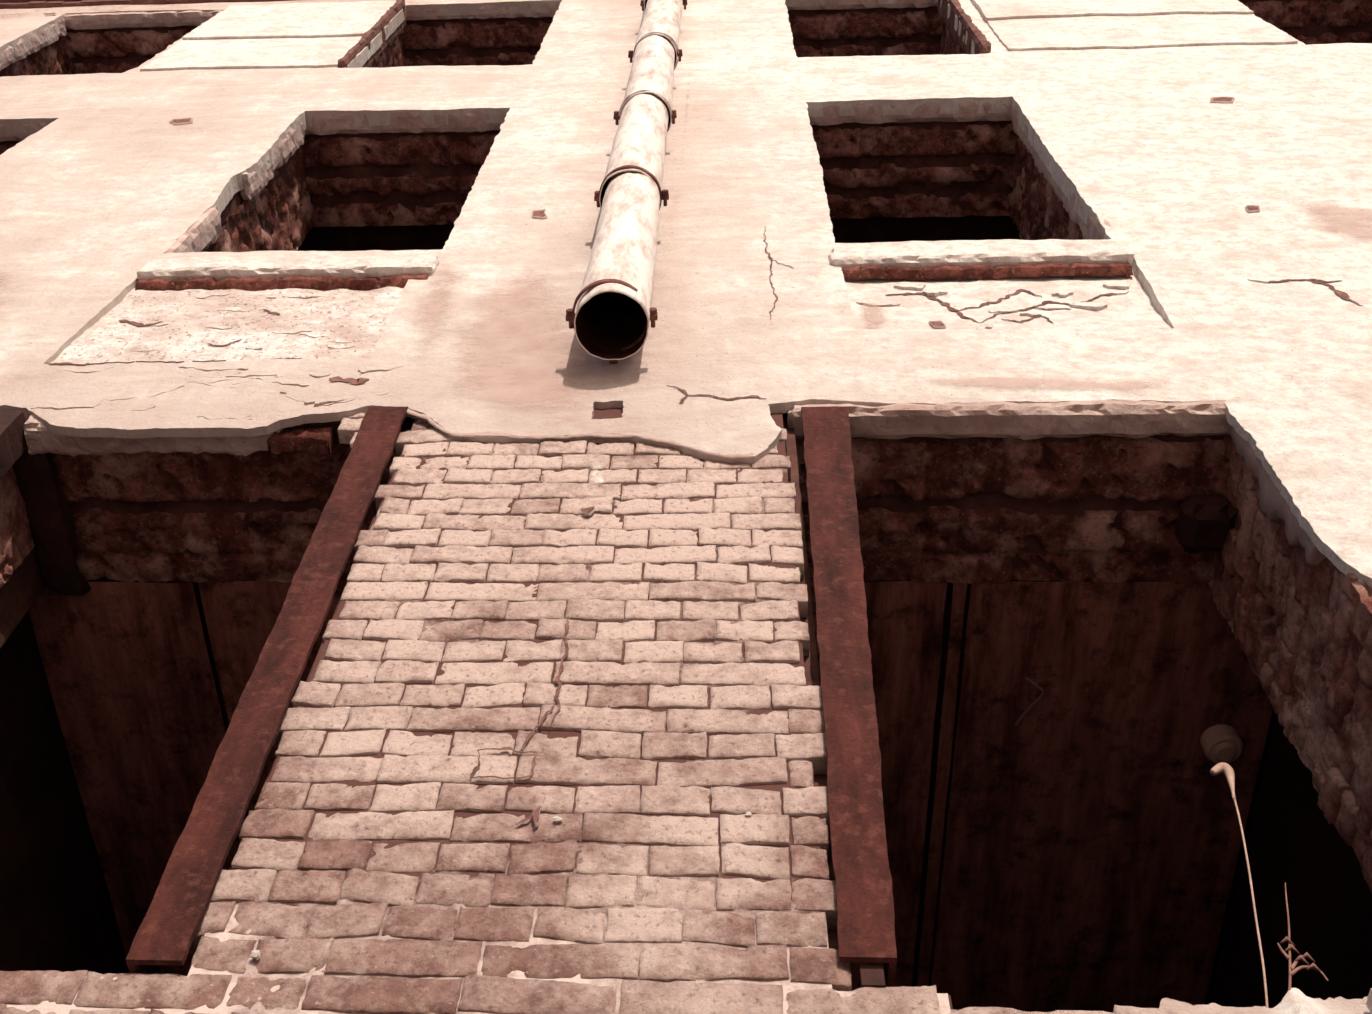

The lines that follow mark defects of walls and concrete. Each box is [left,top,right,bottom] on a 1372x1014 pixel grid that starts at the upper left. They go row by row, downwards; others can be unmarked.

peeling [195,292,250,330]
peeling [266,288,341,299]
crack [763,229,793,320]
crack [856,282,1130,329]
crack [1247,278,1363,306]
peeling [272,324,355,349]
peeling [358,362,409,375]
peeling [24,347,389,455]
crack [666,385,767,404]
spalling [1208,425,1372,893]
flaking render [187,408,852,991]